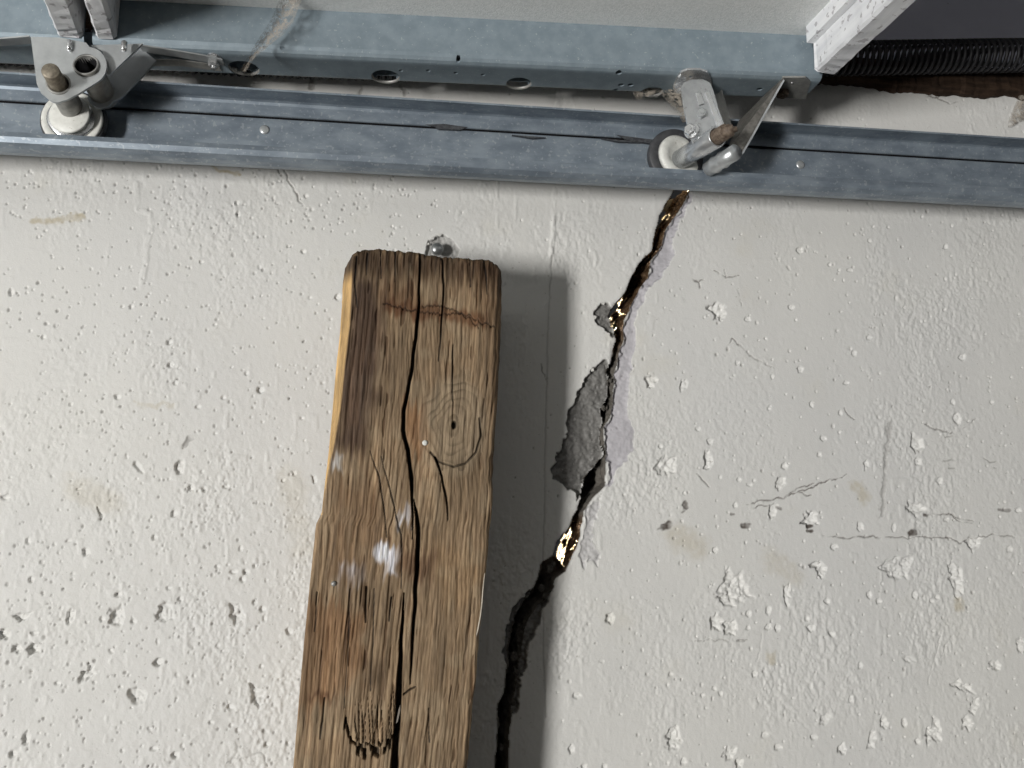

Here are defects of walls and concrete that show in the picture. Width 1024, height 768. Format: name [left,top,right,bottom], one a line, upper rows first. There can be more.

spalling [550,192,695,572]
crack [495,190,689,768]
peeling [707,547,793,638]
crack [744,473,849,510]
crack [809,512,1017,545]
peeling [872,531,984,606]